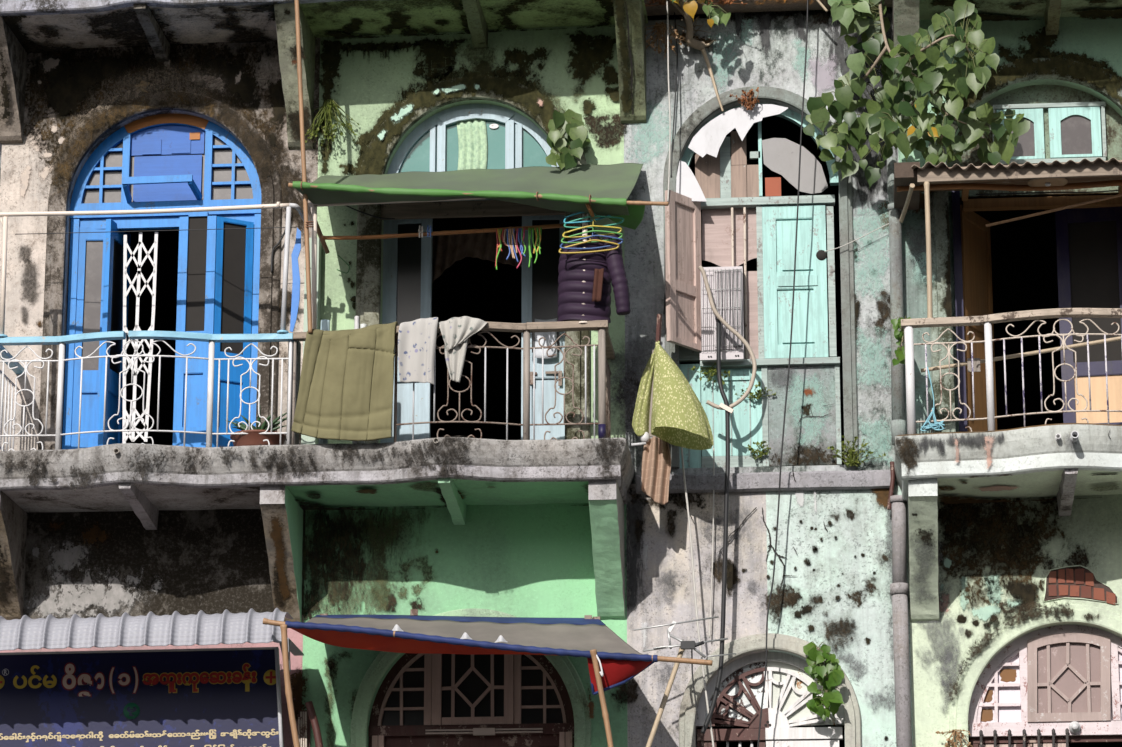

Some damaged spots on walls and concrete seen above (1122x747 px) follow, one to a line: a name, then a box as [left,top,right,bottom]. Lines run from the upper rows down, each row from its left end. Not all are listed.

leakage [925,0,1040,22]
leakage [0,51,12,124]
leakage [2,0,471,227]
leakage [486,0,642,113]
leakage [0,452,106,491]
leakage [127,443,319,486]
leakage [330,435,473,507]
leakage [295,493,438,620]
leakage [624,488,888,678]
leakage [893,432,1099,711]
flaking render [1043,565,1118,605]
leakage [611,679,640,710]